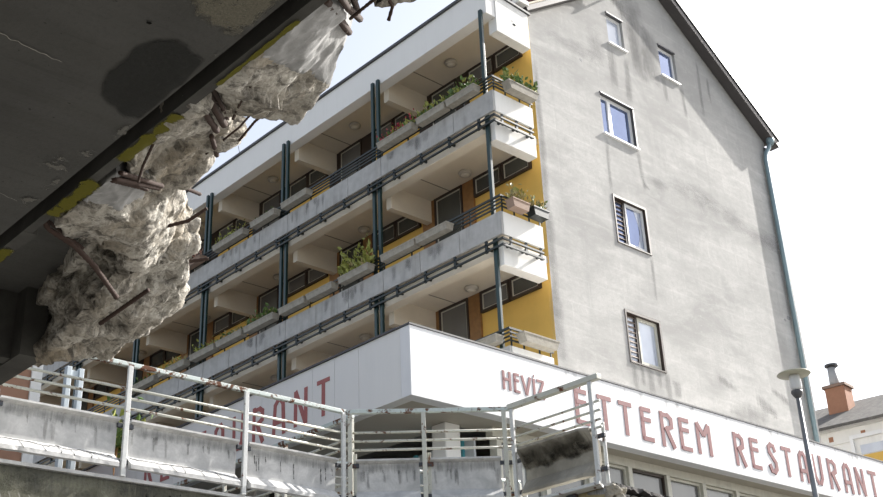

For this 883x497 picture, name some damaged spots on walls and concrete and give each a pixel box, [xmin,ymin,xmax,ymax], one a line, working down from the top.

spalling [33,0,416,367]
spalling [604,481,637,497]